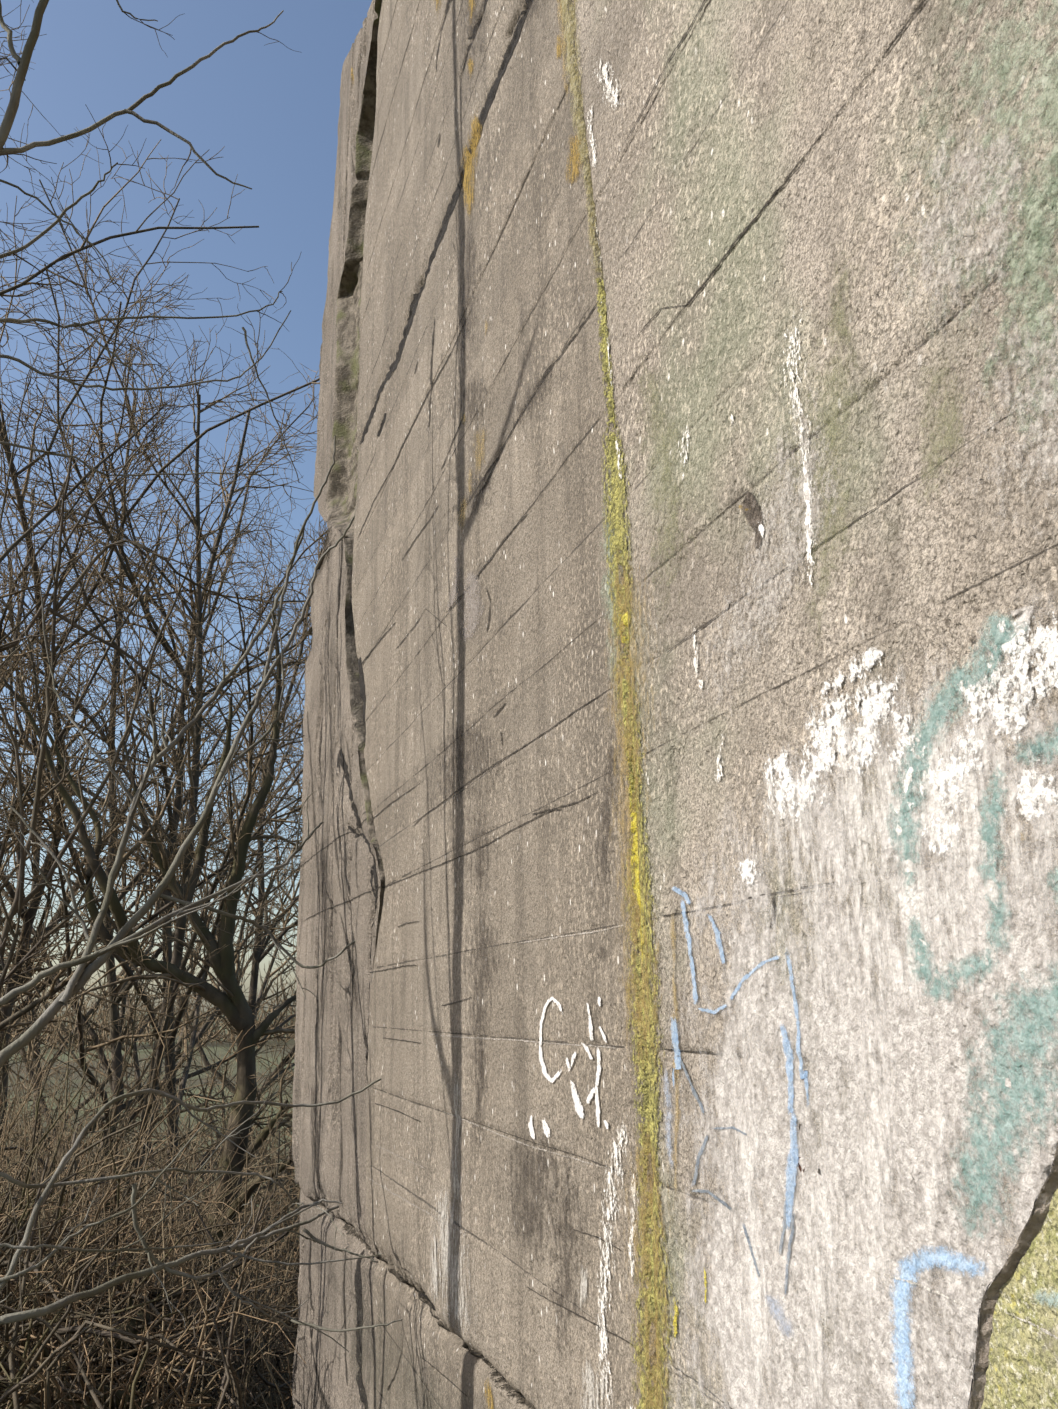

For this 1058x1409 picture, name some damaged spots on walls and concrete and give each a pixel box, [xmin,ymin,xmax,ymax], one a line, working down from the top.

crack [358,0,533,537]
rust [462,115,482,213]
spalling [292,0,381,1409]
crack [296,514,623,1409]
crack [527,1287,636,1348]